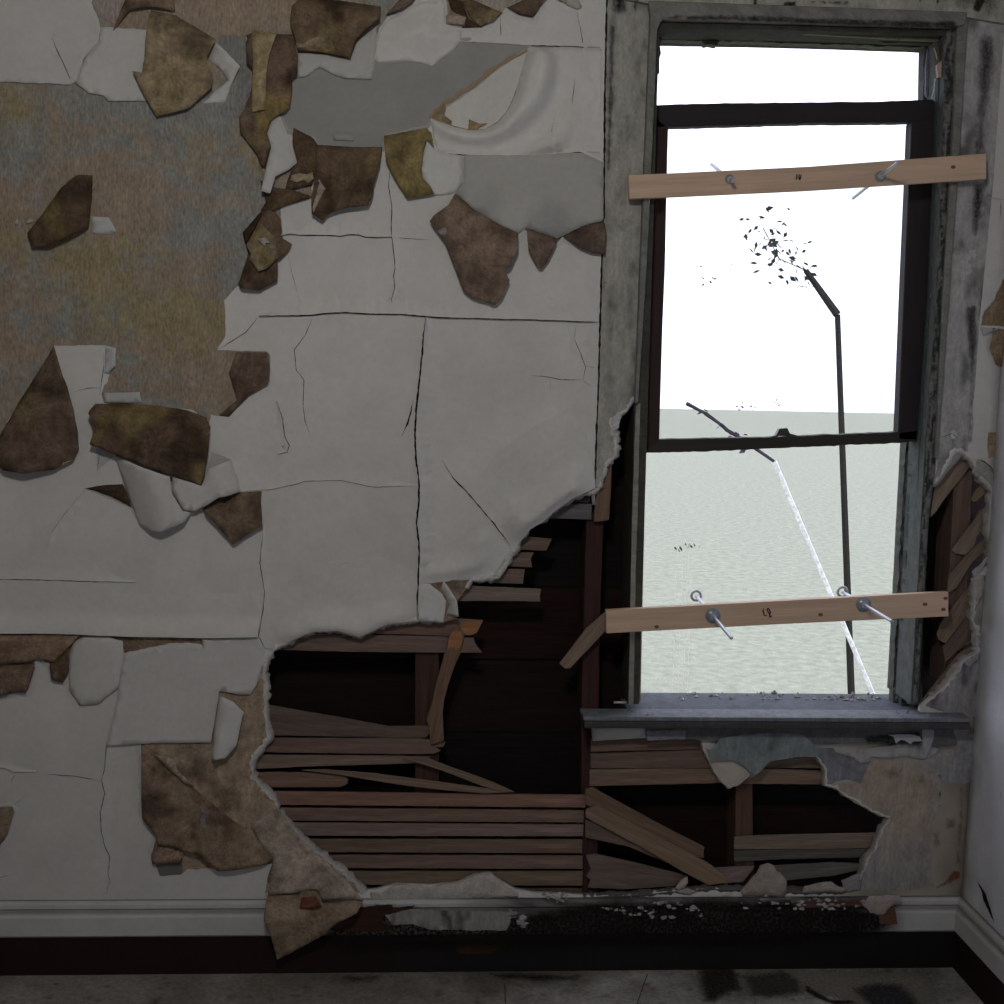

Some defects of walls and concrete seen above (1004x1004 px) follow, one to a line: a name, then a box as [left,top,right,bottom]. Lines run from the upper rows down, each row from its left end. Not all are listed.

peeling [93,0,125,24]
peeling [219,35,252,121]
water stain [675,16,956,29]
peeling [942,28,955,157]
water stain [980,41,992,103]
water stain [974,186,982,230]
crack [221,168,603,620]
spalling [465,396,634,589]
peeling [893,182,994,717]
spalling [249,617,528,932]
peeling [582,730,955,925]
peeling [542,891,569,903]